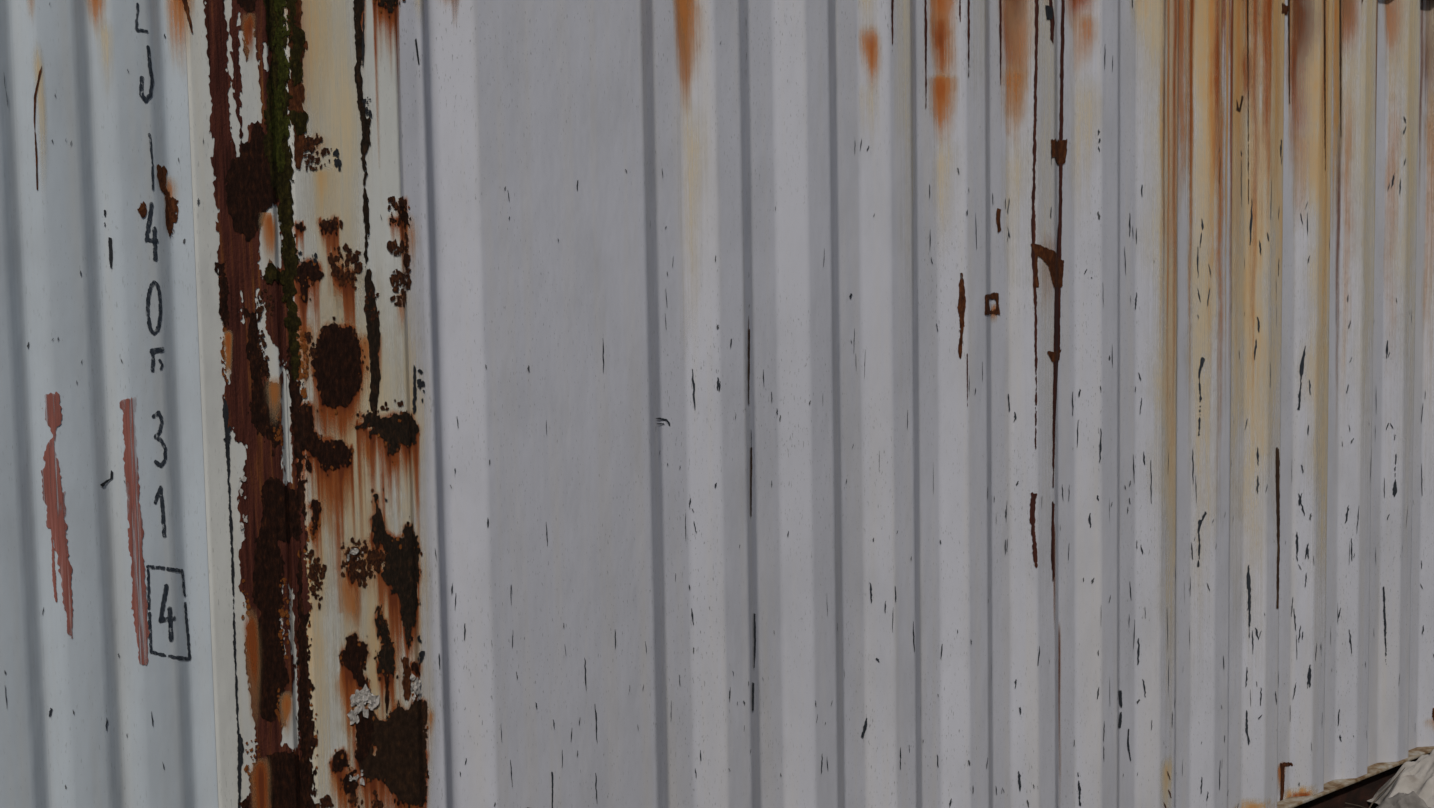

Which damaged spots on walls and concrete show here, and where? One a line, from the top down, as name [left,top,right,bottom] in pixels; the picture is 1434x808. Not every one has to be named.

corrosion [285,0,324,170]
corrosion [676,0,694,95]
corrosion [862,0,970,130]
corrosion [1341,0,1434,302]
spalling [197,0,437,808]
corrosion [294,215,357,361]
corrosion [957,273,968,406]
corrosion [985,292,1000,318]
corrosion [999,0,1092,603]
corrosion [401,635,425,701]
corrosion [329,748,365,808]
corrosion [1242,762,1312,808]